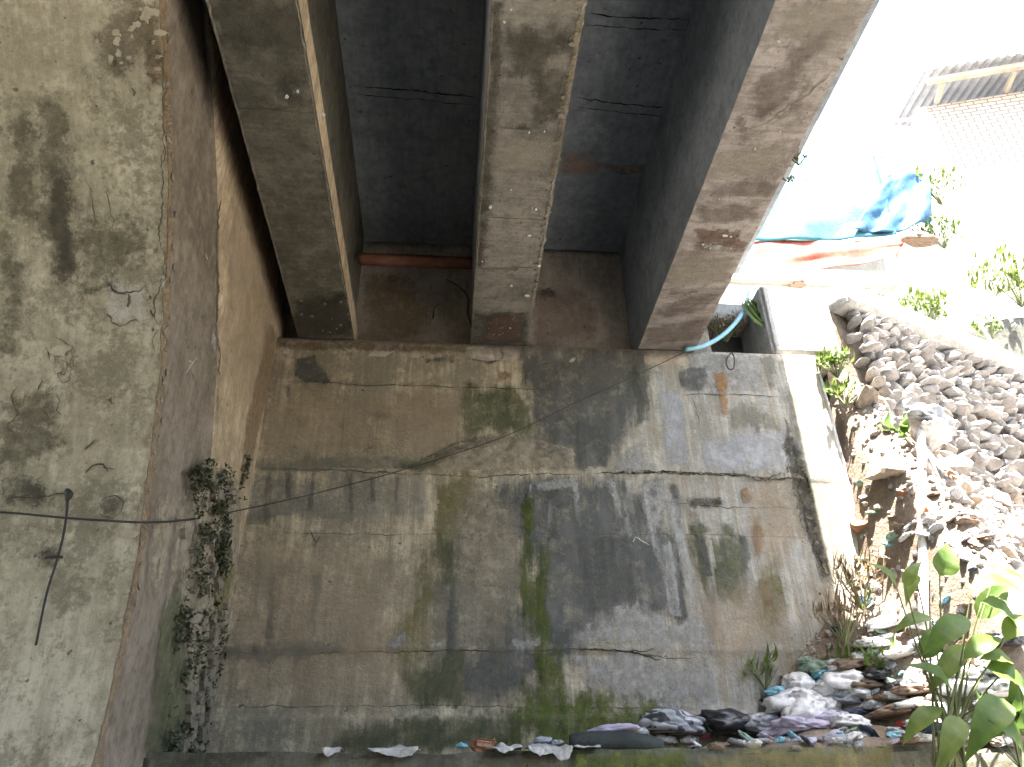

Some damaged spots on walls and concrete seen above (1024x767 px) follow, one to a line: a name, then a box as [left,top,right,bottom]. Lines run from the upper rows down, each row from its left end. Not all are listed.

crack [584,13,689,31]
crack [350,85,479,105]
crack [576,97,662,117]
water stain [1,102,147,298]
water stain [0,259,25,354]
spalling [92,0,177,767]
rust [715,373,728,414]
crack [259,393,828,577]
water stain [423,312,842,713]
crack [237,648,703,661]